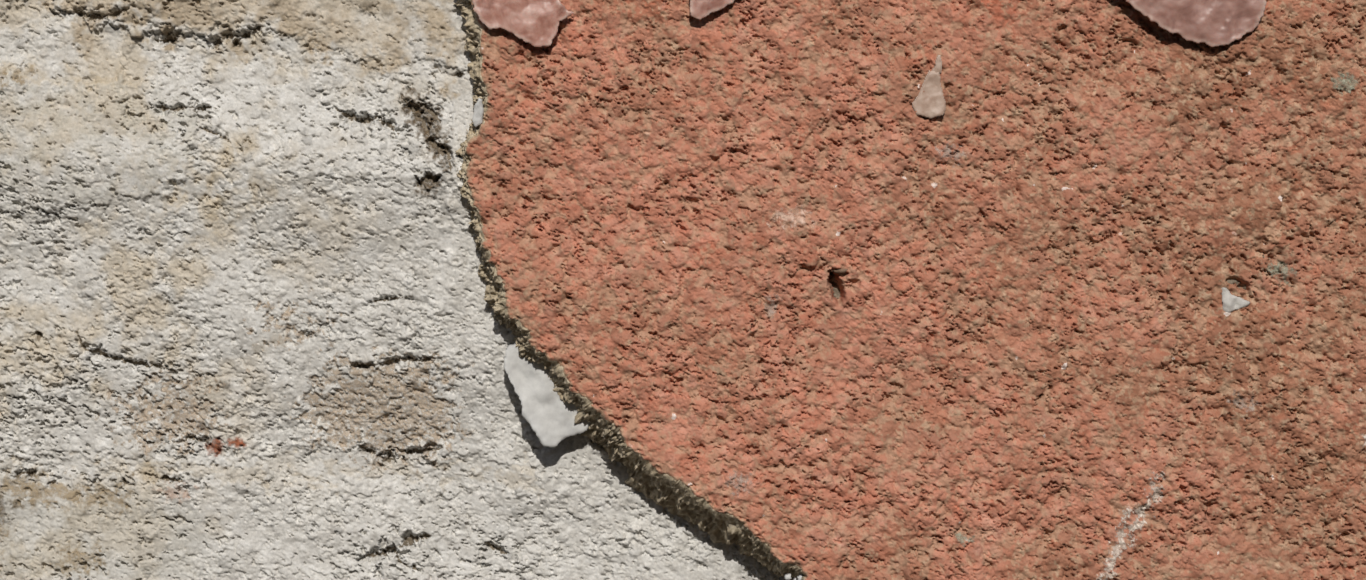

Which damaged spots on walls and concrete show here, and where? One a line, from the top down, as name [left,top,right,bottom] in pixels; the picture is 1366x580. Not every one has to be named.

spalling [453,0,807,580]
spalling [829,268,848,299]
spalling [98,370,228,455]
spalling [243,300,471,473]